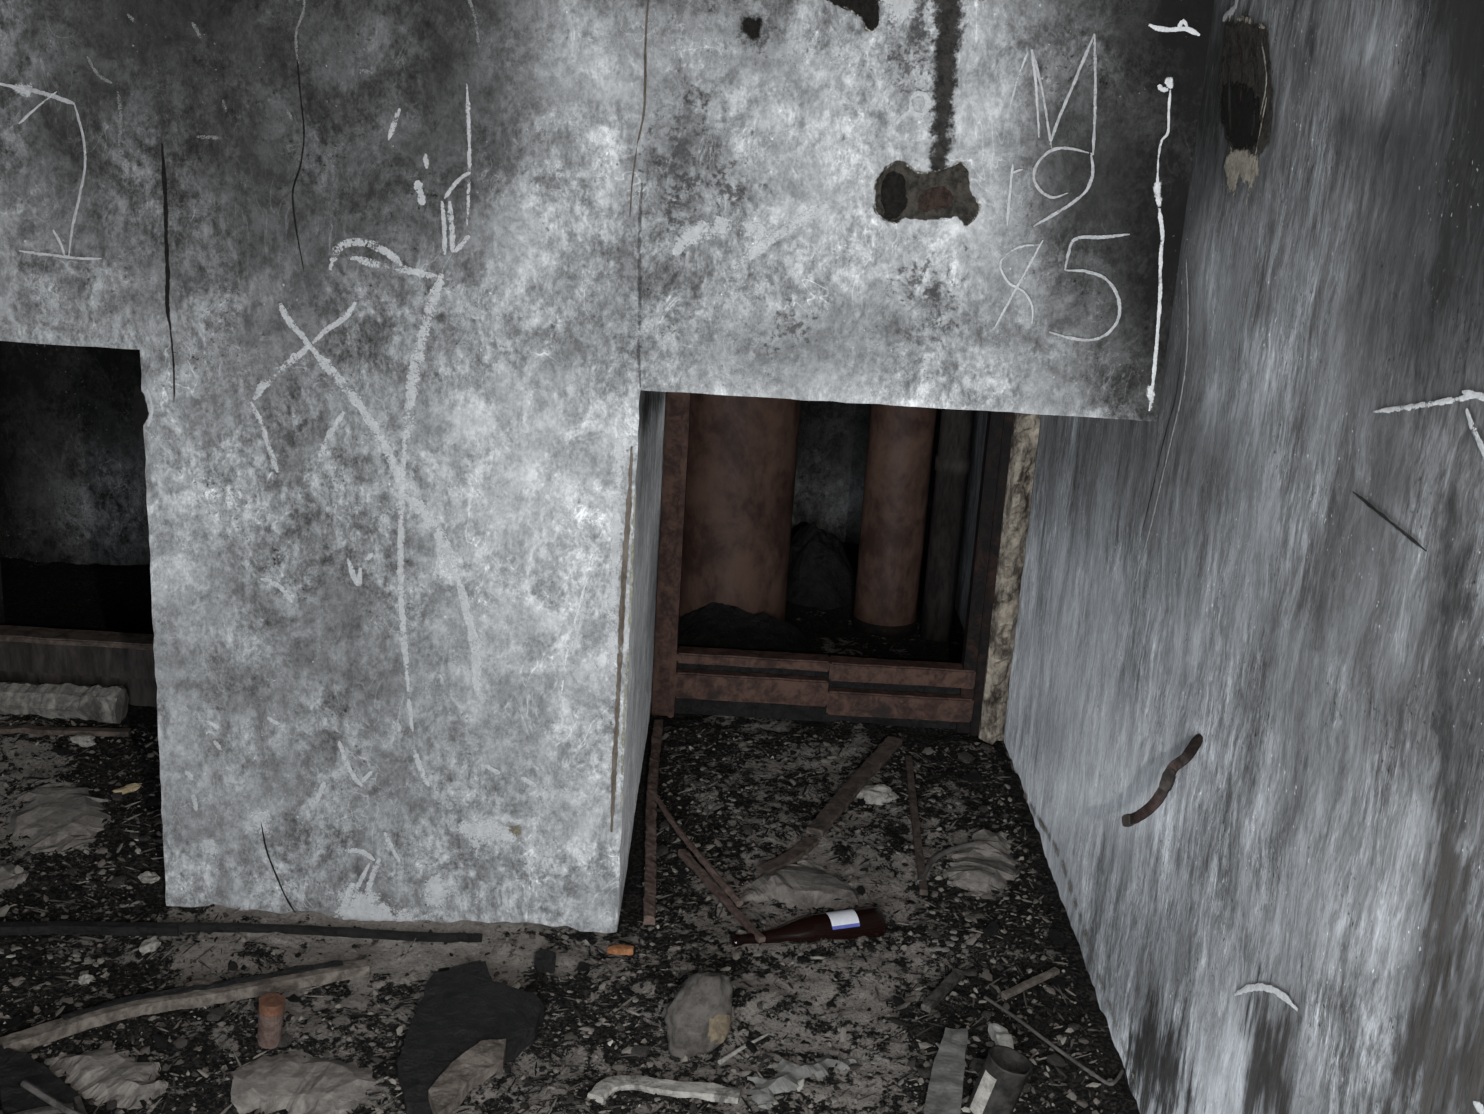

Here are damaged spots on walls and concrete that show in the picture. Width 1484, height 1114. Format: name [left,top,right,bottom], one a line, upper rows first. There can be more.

crack [157,68,175,397]
crack [629,0,649,388]
spalling [827,0,916,32]
spalling [1218,0,1273,205]